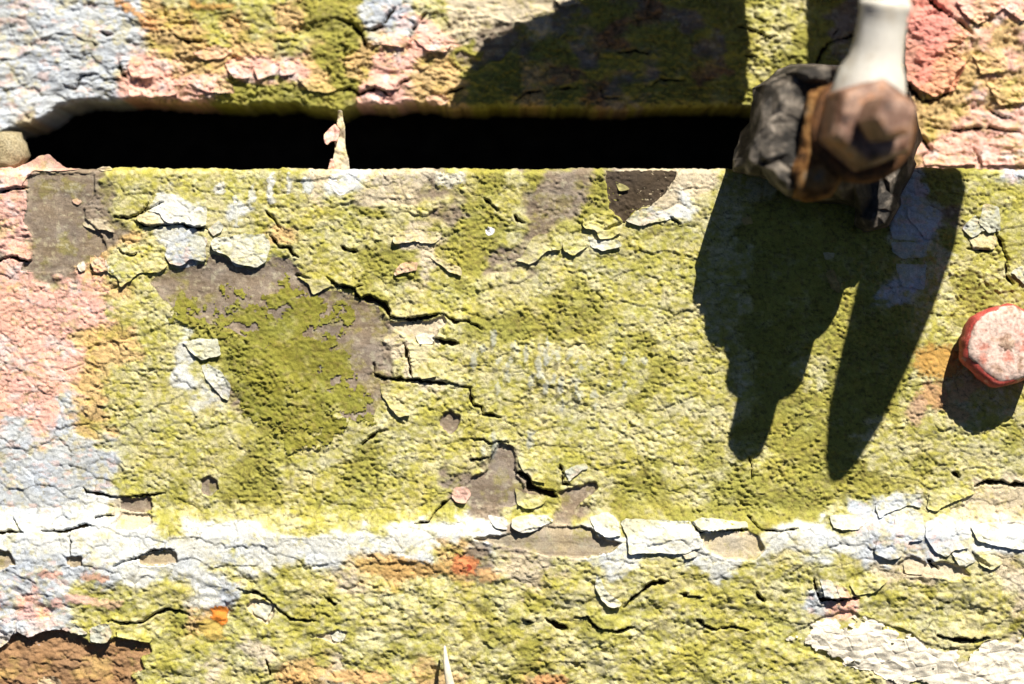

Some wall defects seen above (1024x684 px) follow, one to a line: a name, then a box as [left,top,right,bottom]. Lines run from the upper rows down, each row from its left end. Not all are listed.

peeling [357,75,401,105]
peeling [370,0,581,70]
peeling [905,0,1024,105]
peeling [923,133,1024,166]
peeling [516,170,677,264]
peeling [0,154,446,421]
crack [330,279,506,461]
peeling [452,442,765,562]
peeling [830,481,1024,581]
crack [952,472,1024,487]
crack [524,579,748,633]
spalling [786,615,1024,684]